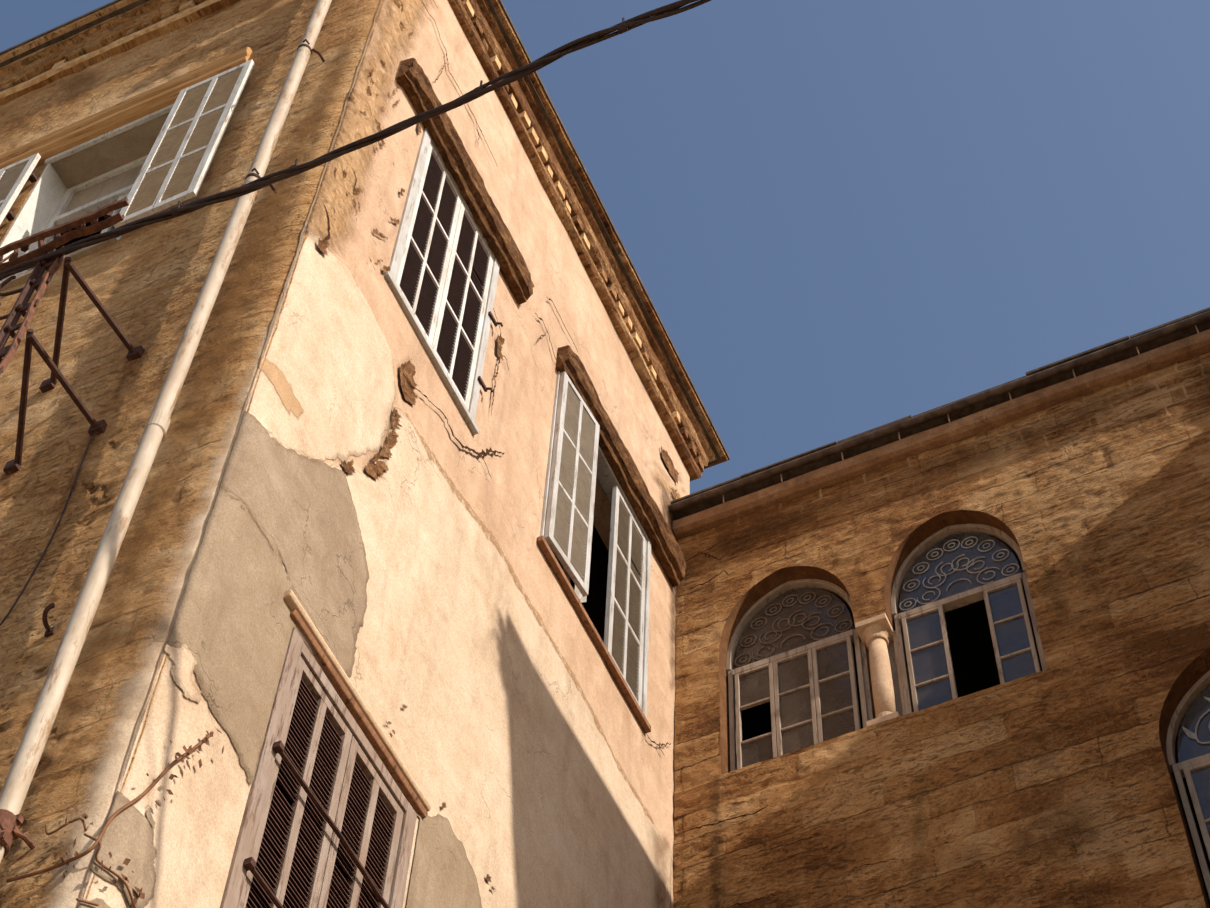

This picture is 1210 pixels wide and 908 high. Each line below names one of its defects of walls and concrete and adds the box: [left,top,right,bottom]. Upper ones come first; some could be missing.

crack [491,308,509,415]
crack [536,298,578,362]
spalling [342,358,418,479]
crack [403,374,505,475]